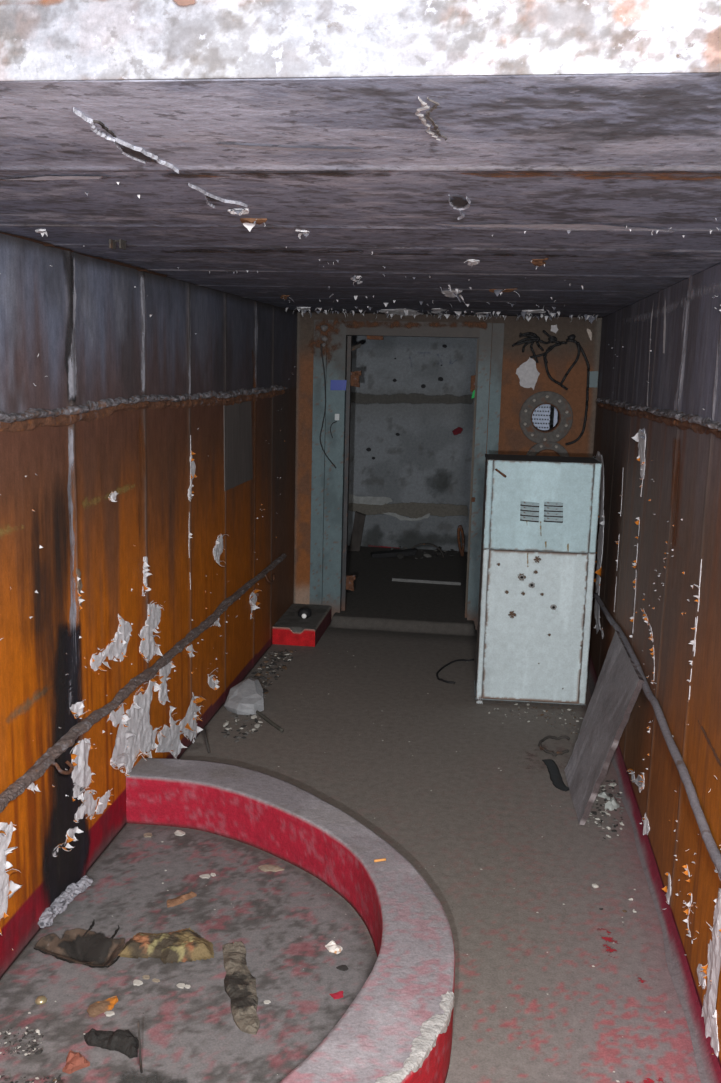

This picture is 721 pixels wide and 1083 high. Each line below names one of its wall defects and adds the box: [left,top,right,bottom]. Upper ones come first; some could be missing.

corrosion [570,172,721,181]
leakage [68,262,77,397]
peeling [280,258,598,333]
spalling [516,358,540,390]
corrosion [0,385,287,471]
corrosion [596,397,721,546]
leakage [67,430,76,643]
peeling [213,534,229,567]
peeling [52,556,227,857]
peeling [640,813,650,835]
peeling [662,820,721,1058]
spalling [375,991,454,1083]